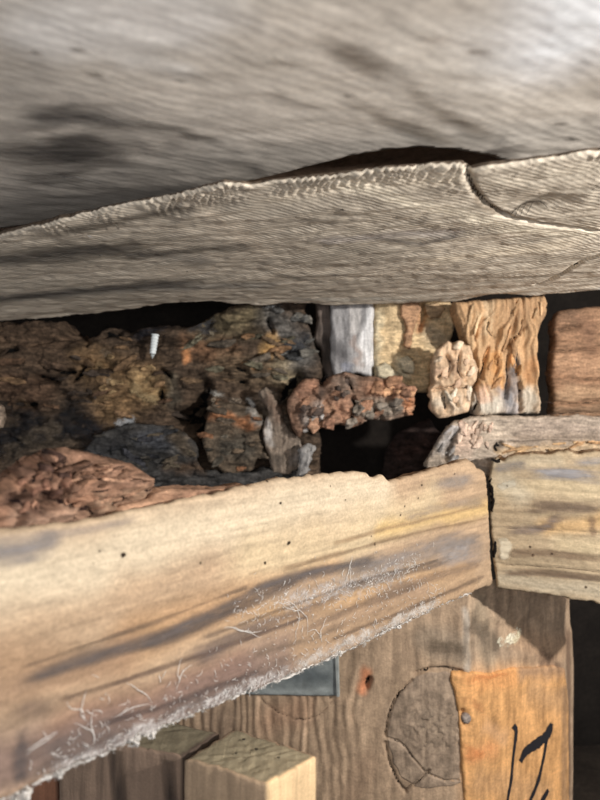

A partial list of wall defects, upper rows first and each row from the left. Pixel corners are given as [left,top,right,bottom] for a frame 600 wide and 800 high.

crack [466,164,549,216]
damp [0,534,53,556]
damp [35,552,413,679]
damp [385,599,435,629]
damp [110,667,164,685]
damp [50,671,283,766]
crack [386,666,457,786]